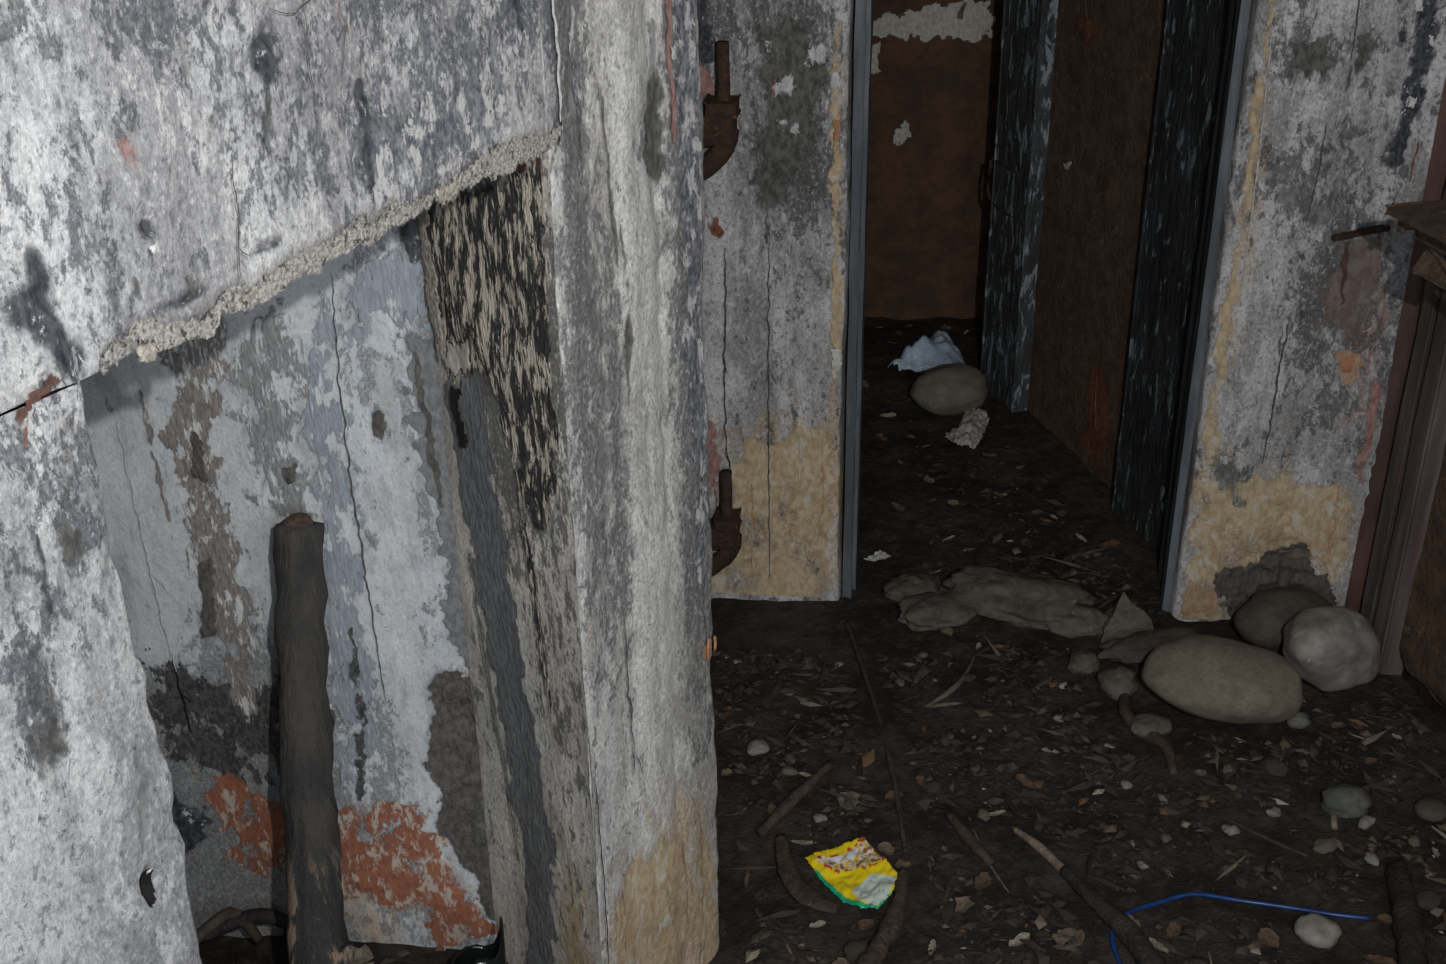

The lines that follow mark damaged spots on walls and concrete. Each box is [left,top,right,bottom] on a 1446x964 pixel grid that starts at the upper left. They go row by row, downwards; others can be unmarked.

peeling [871,0,996,75]
rust [699,65,716,107]
peeling [893,120,912,174]
rust [705,213,724,238]
peeling [1202,0,1275,465]
rust [707,421,722,505]
peeling [101,126,564,964]
water stain [702,417,838,639]
water stain [1177,454,1354,620]
spalling [1214,542,1338,621]
water stain [613,793,719,964]